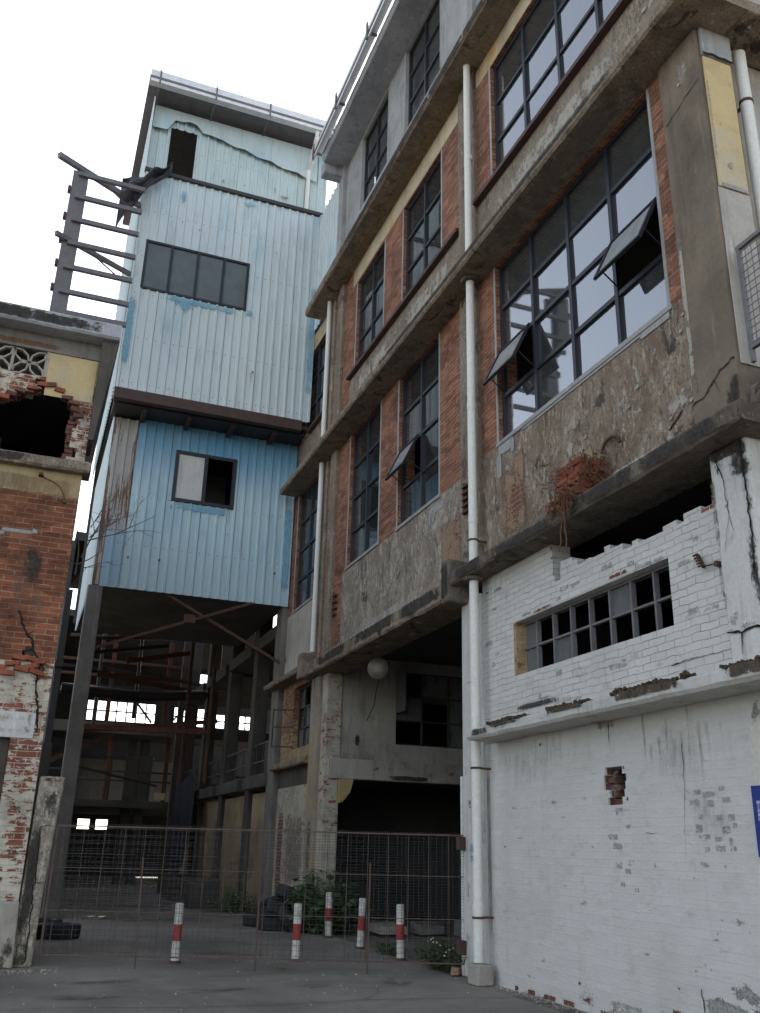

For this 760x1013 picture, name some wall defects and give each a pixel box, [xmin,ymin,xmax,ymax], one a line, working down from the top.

spalling [0,381,89,459]
crack [669,356,734,431]
flaking render [501,449,543,535]
crack [715,439,760,589]
hole [0,646,46,677]
crack [18,610,46,733]
crack [671,624,760,666]
spalling [605,766,628,805]
spalling [515,986,591,1007]
peeling [707,983,760,1013]